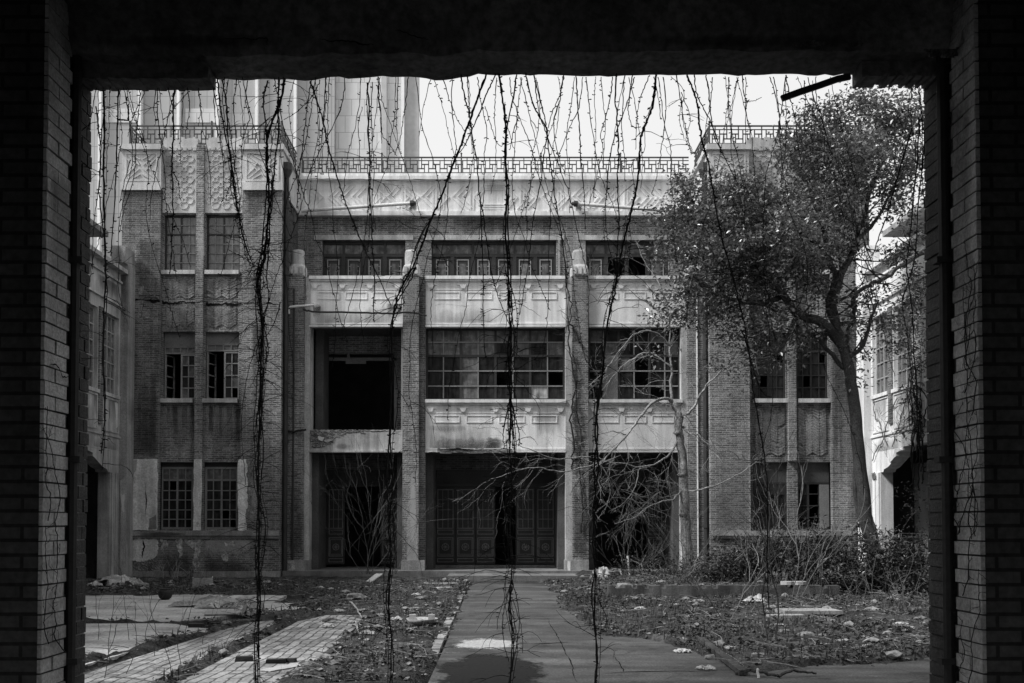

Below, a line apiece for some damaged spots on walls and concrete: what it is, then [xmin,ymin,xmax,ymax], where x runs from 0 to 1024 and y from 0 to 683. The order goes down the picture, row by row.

crack [135,299,276,318]
water stain [445,439,500,448]
peeling [132,459,202,571]